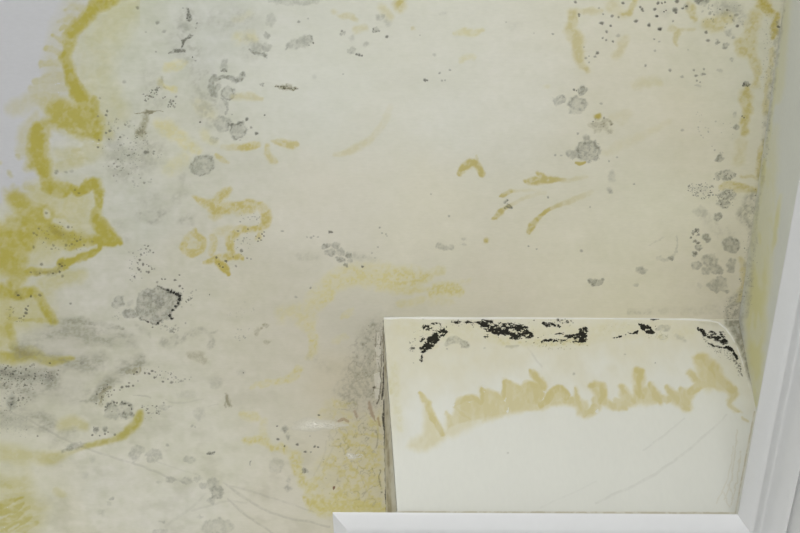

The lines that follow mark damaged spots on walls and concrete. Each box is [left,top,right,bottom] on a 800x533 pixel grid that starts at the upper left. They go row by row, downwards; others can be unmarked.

leakage [0,0,300,533]
leakage [207,0,796,520]